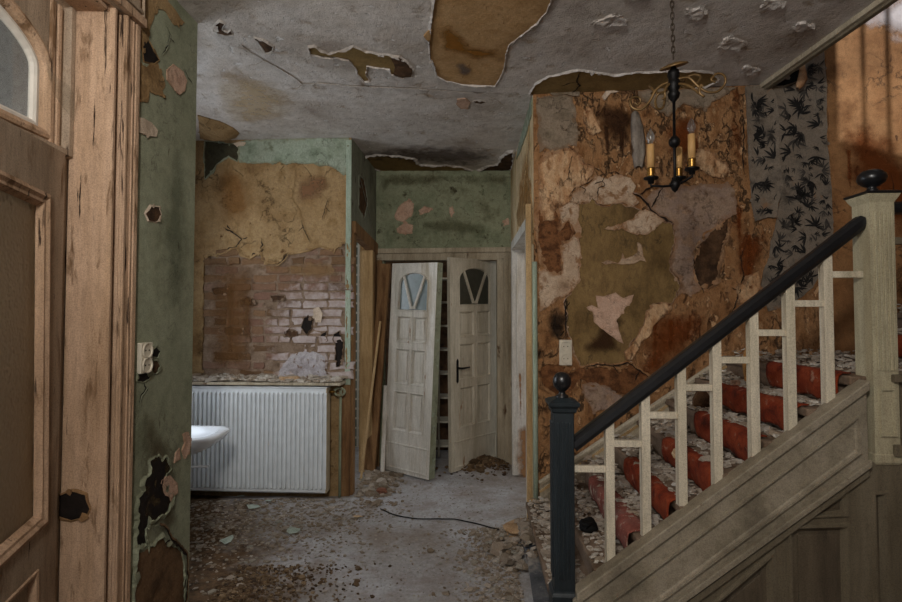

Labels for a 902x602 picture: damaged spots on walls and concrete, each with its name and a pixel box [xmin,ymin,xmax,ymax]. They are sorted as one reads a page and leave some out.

flaking render [139,0,187,103]
spalling [307,45,414,83]
spalling [424,0,554,87]
peeling [203,137,349,180]
spalling [365,69,721,172]
crack [216,225,288,266]
flaking render [200,241,356,380]
crack [290,164,330,243]
spalling [502,147,680,397]
spalling [693,218,732,292]
peeling [735,272,763,306]
spalling [130,432,192,602]